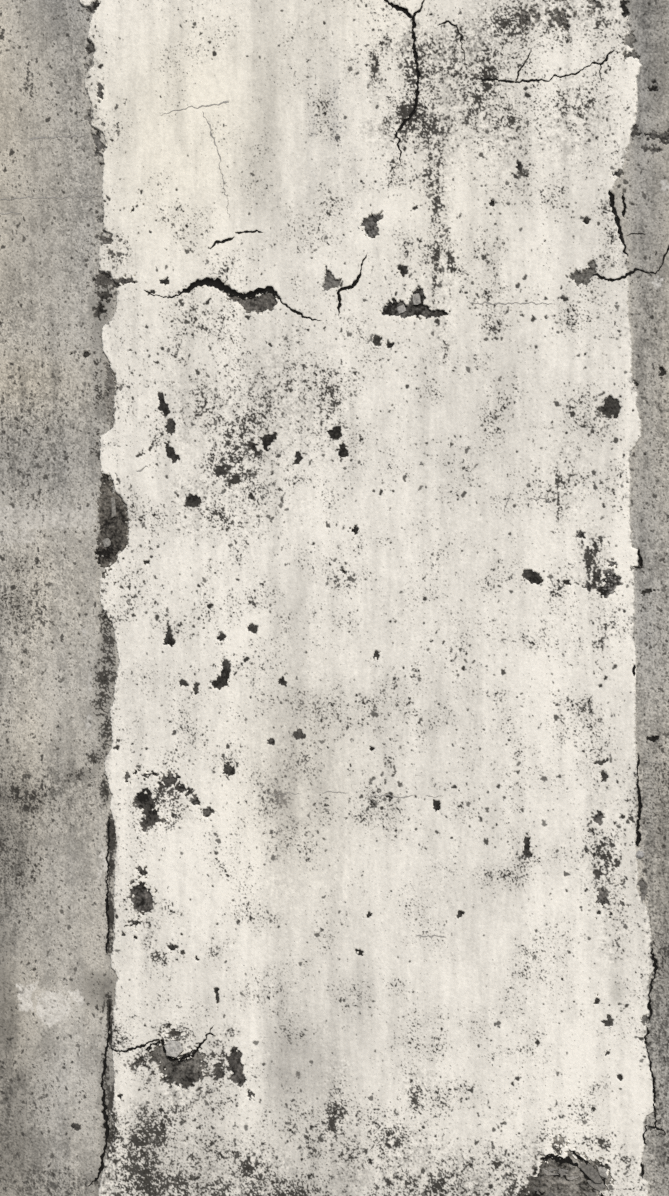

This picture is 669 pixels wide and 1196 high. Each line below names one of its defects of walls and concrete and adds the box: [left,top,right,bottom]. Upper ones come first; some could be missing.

spalling [621,5,640,59]
crack [384,0,614,162]
crack [145,101,367,321]
crack [593,233,669,281]
spalling [91,471,129,578]
spalling [130,1033,255,1100]
spalling [533,1134,615,1196]